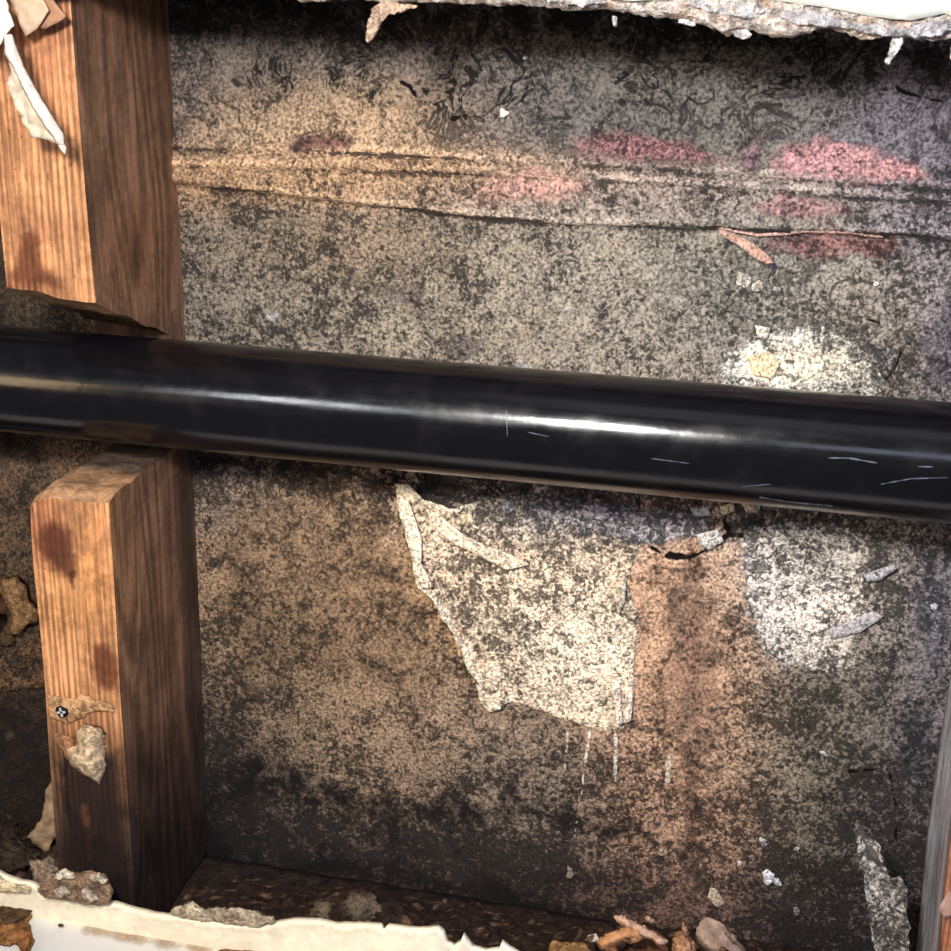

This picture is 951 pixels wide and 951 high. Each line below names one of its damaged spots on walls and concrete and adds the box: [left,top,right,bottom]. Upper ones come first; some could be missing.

spalling [0,574,45,693]
damp [39,524,75,583]
peeling [395,484,897,733]
crack [649,515,745,560]